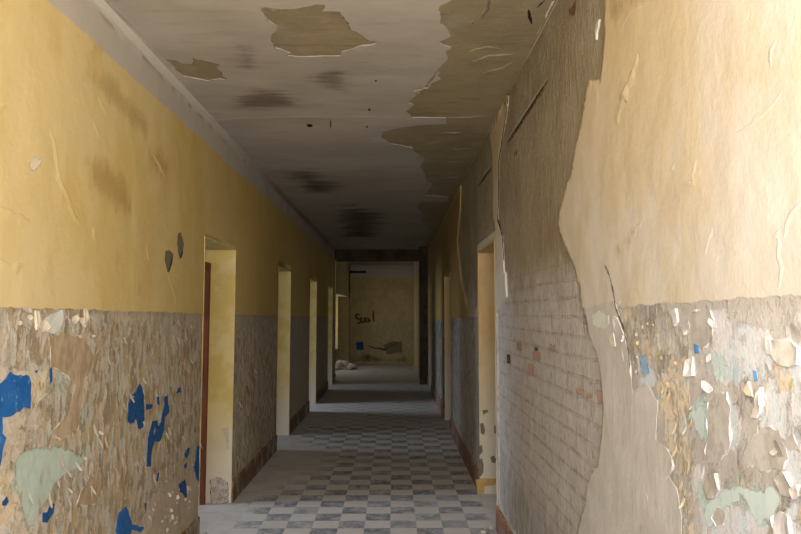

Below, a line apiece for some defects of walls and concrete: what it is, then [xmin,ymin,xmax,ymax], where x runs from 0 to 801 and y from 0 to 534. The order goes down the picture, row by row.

spalling [261,5,378,57]
spalling [166,58,226,81]
spalling [382,0,604,534]
flaking render [12,308,96,440]
crack [604,265,632,387]
flaking render [622,309,733,528]
peeling [743,381,764,418]
peeling [764,321,801,371]
peeling [21,421,109,521]
peeling [142,484,199,532]
flaking render [742,425,801,500]
peeling [767,511,793,534]